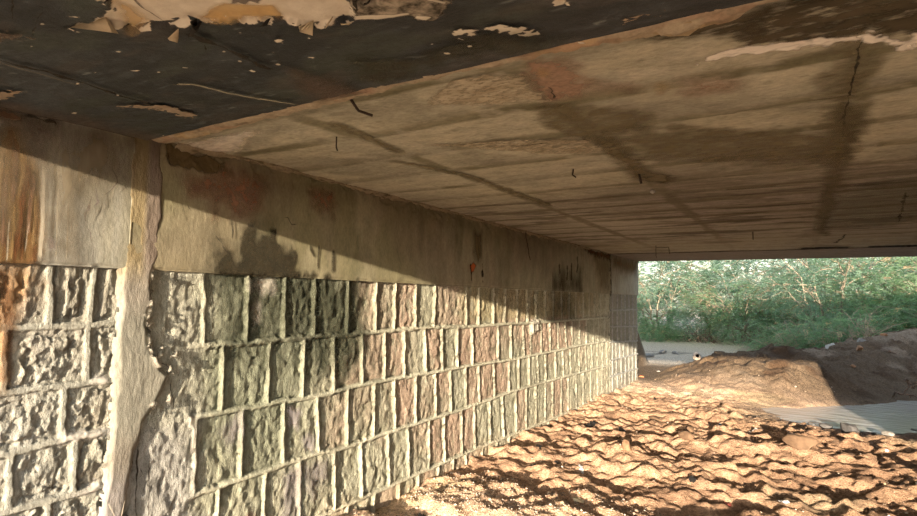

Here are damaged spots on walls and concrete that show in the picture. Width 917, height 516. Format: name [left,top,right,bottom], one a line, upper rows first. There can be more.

spalling [68,0,451,43]
leakage [538,65,865,234]
crack [837,42,862,135]
corrosion [0,127,41,375]
spalling [145,270,179,374]
leakage [213,224,363,376]